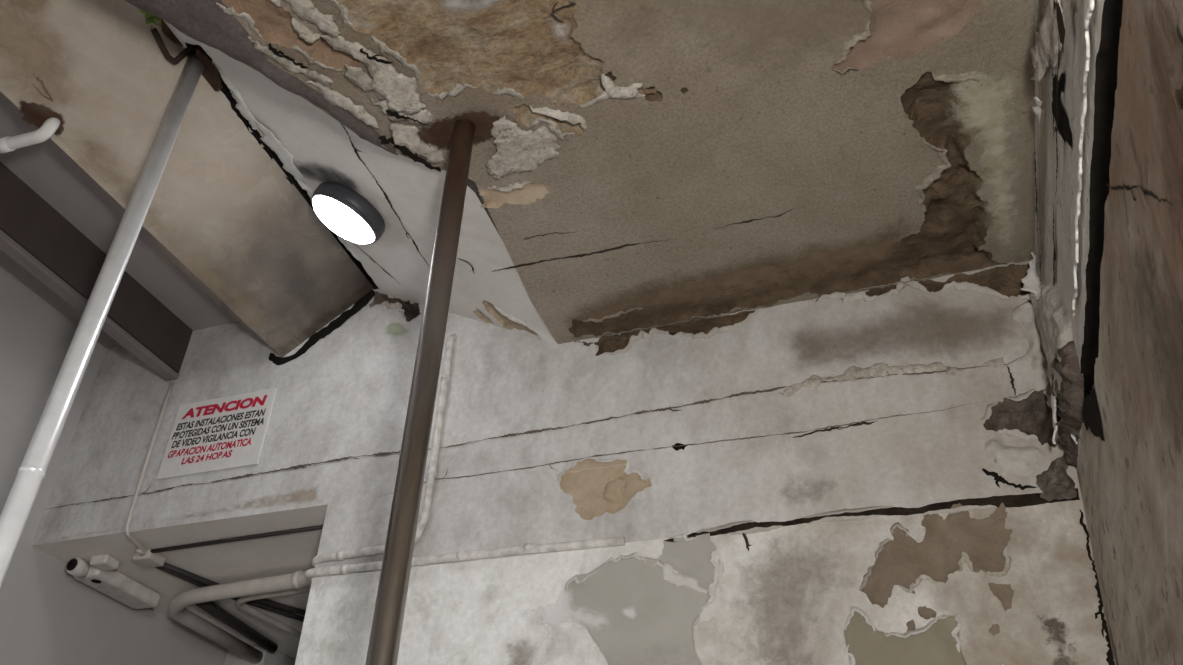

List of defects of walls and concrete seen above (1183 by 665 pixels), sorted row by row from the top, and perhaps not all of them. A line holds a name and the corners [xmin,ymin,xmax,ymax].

crack [268,43,309,69]
flaking render [212,0,663,209]
leakage [955,75,1019,250]
leakage [575,230,900,326]
leakage [797,312,999,359]
crack [44,451,400,510]
flaking render [557,456,651,520]
crack [424,354,1027,483]
crack [982,468,1036,490]
spalling [981,341,1084,501]
peeling [565,533,725,665]
peeling [844,503,1014,665]